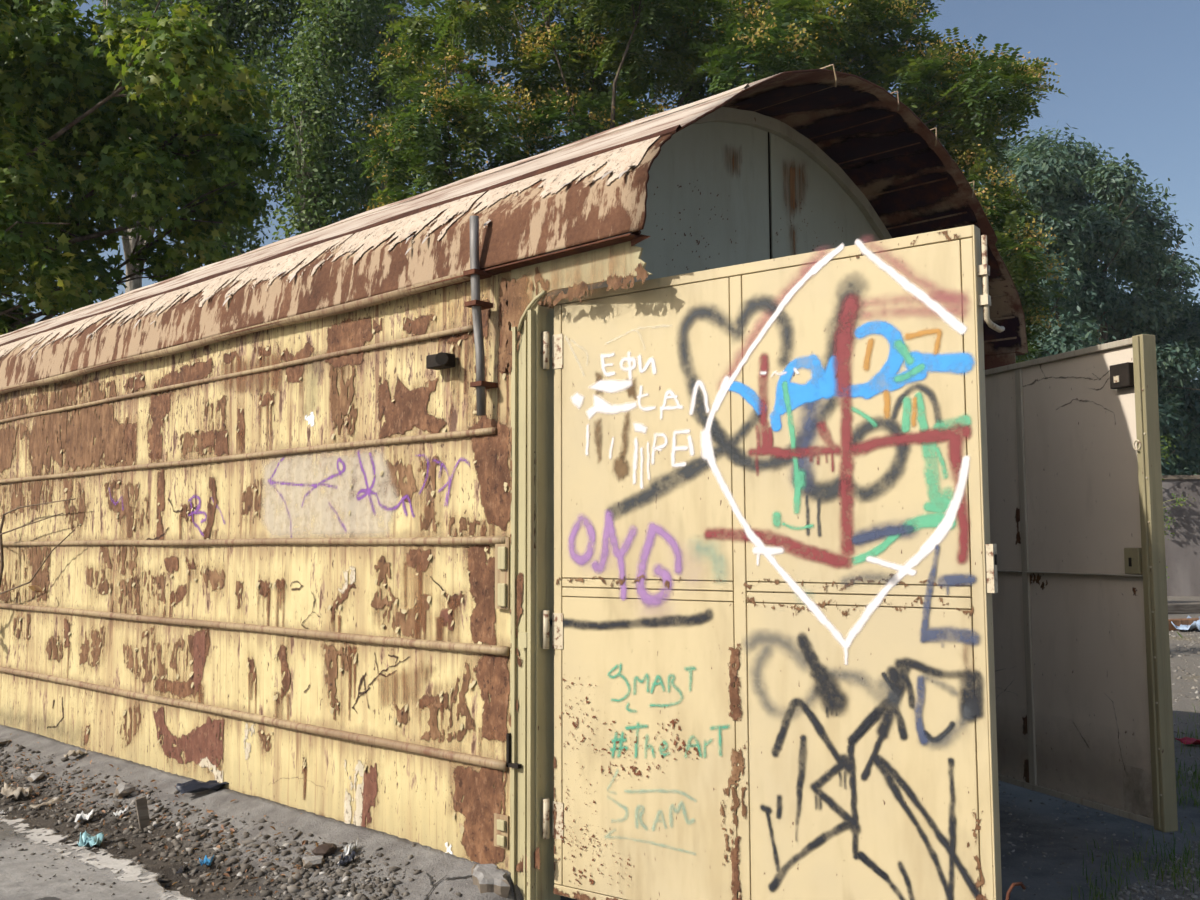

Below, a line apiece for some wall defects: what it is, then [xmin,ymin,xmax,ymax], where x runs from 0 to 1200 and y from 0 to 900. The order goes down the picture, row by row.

rust [731,83,1005,281]
peeling [0,136,659,372]
rust [983,314,1022,350]
crack [1023,366,1116,424]
peeling [418,455,487,537]
peeling [86,478,188,689]
peeling [321,644,349,721]
peeling [421,660,476,743]
rust [727,644,742,721]
peeling [344,760,365,826]
rust [450,674,699,900]
rust [720,739,750,900]